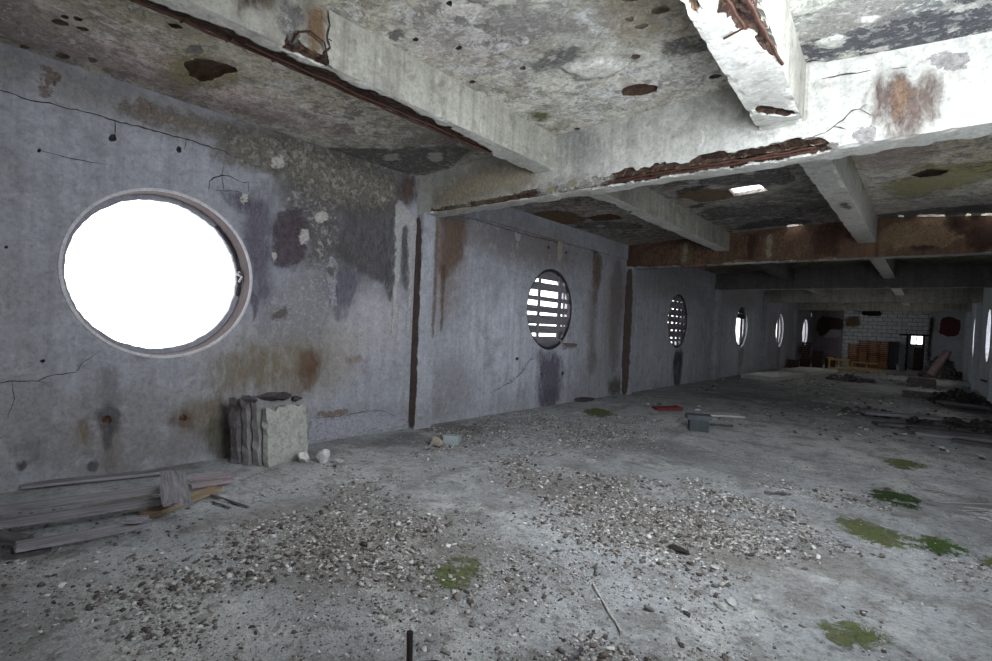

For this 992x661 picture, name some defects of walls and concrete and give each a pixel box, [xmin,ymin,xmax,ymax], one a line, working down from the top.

corrosion [162,52,239,91]
spalling [625,5,670,30]
flaking render [663,36,708,56]
spalling [717,0,784,66]
water stain [872,73,942,135]
crack [0,90,282,209]
flaking render [119,0,492,307]
corrosion [677,189,735,202]
corrosion [876,217,992,254]
corrosion [408,217,422,428]
corrosion [621,241,724,395]
crack [1,351,101,438]